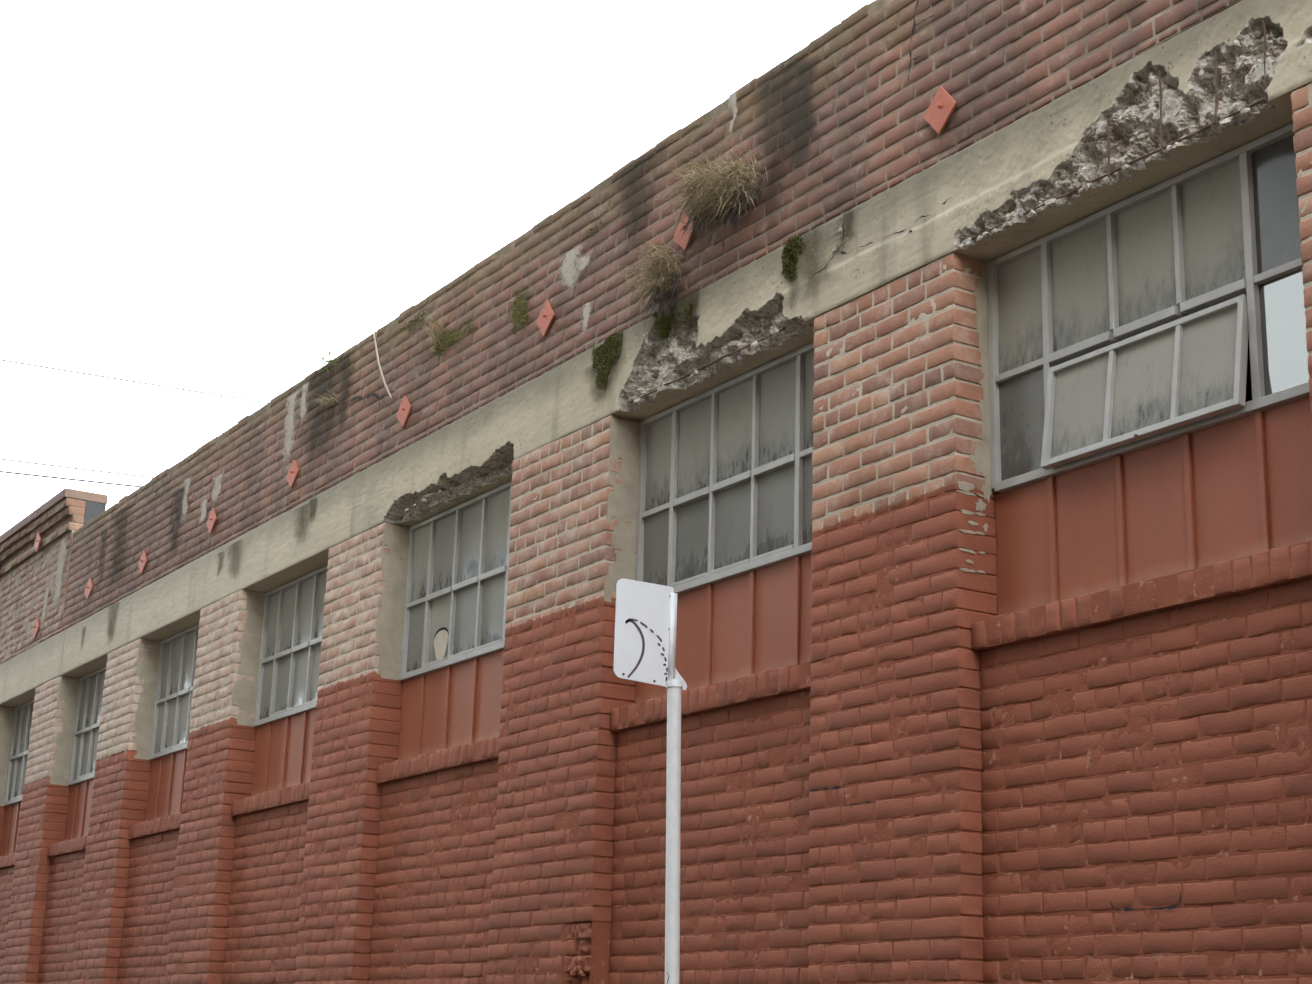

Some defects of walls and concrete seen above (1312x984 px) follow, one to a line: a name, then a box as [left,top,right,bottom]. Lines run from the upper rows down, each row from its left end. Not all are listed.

spalling [953,15,1312,250]
spalling [618,292,814,412]
spalling [383,441,514,524]